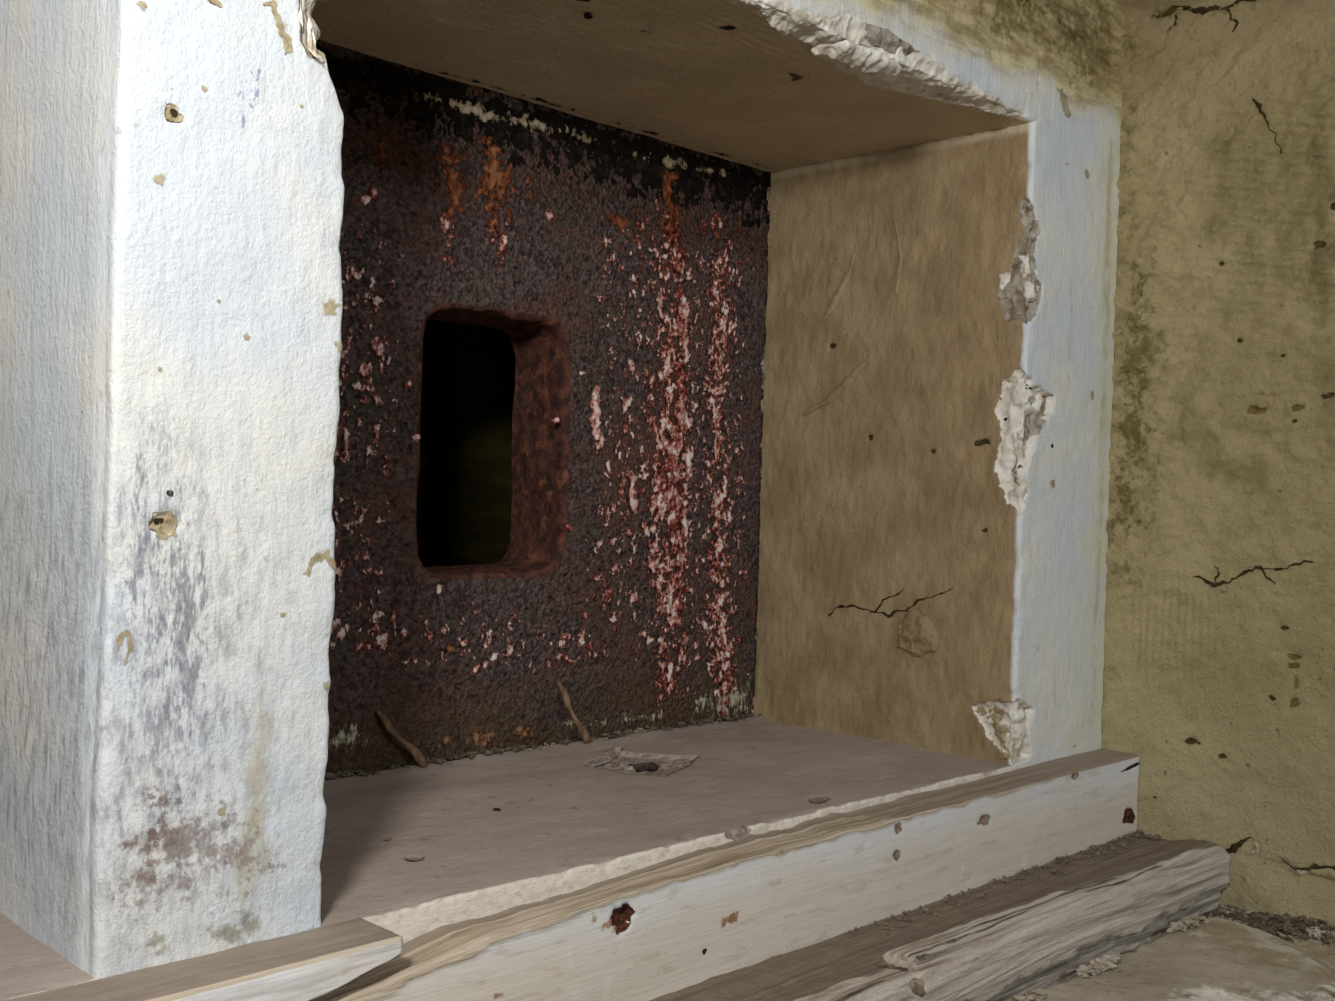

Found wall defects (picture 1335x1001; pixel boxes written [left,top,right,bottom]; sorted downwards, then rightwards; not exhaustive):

crack [1149,0,1256,32]
spalling [739,0,1024,117]
peeling [263,0,771,260]
corrosion [434,134,533,273]
corrosion [589,385,604,454]
corrosion [601,168,750,715]
spalling [974,369,1054,517]
crack [828,588,953,618]
crack [1193,560,1313,588]
spalling [972,699,1034,764]
crack [1225,837,1252,853]
corrosion [602,903,636,935]